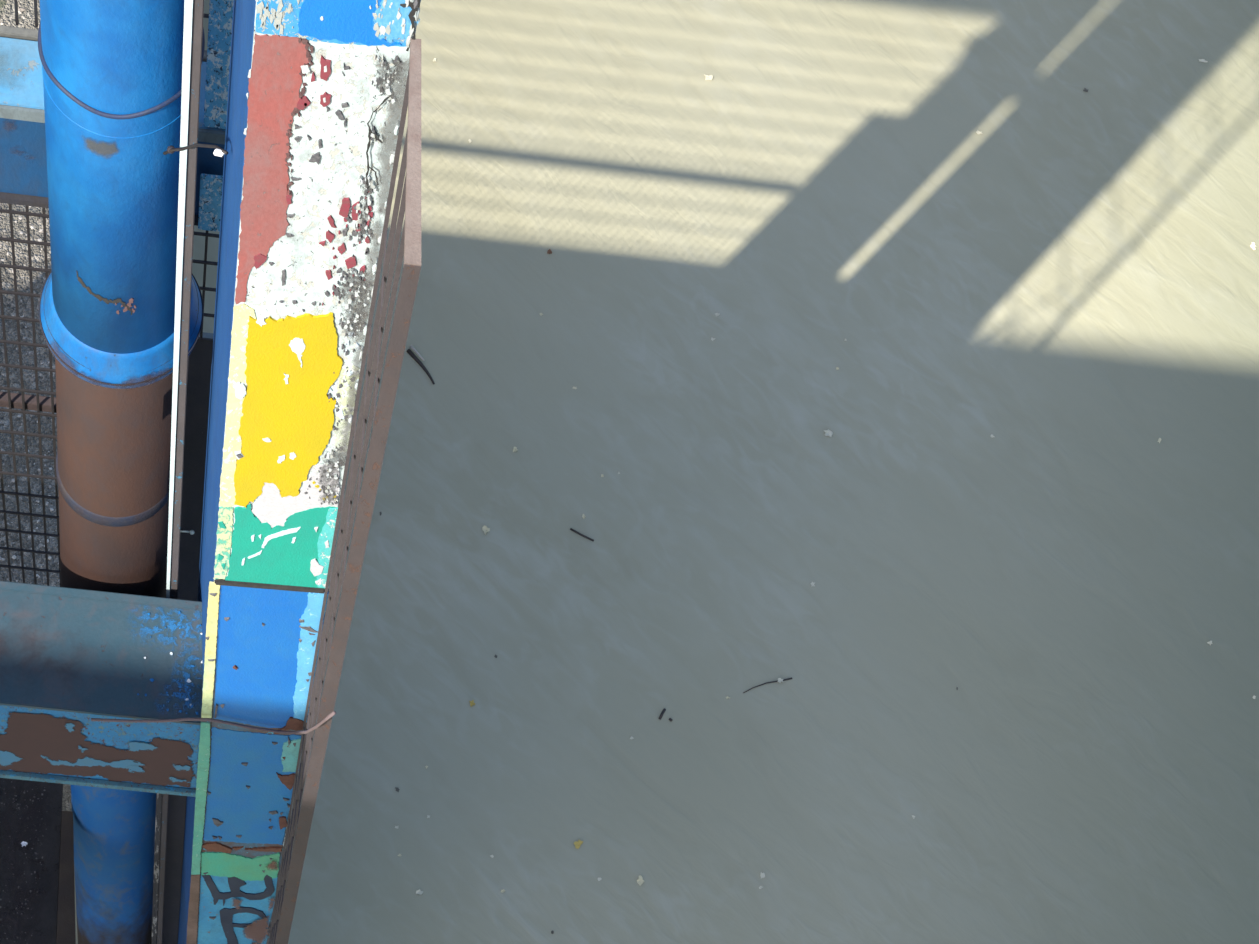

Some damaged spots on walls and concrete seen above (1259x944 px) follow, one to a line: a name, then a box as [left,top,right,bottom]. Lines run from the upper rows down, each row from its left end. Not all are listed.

peeling [369,0,421,48]
rust [86,140,117,156]
peeling [255,0,350,218]
crack [366,95,391,189]
peeling [254,185,387,431]
peeling [233,382,246,399]
peeling [241,454,340,585]
rust [0,712,195,787]